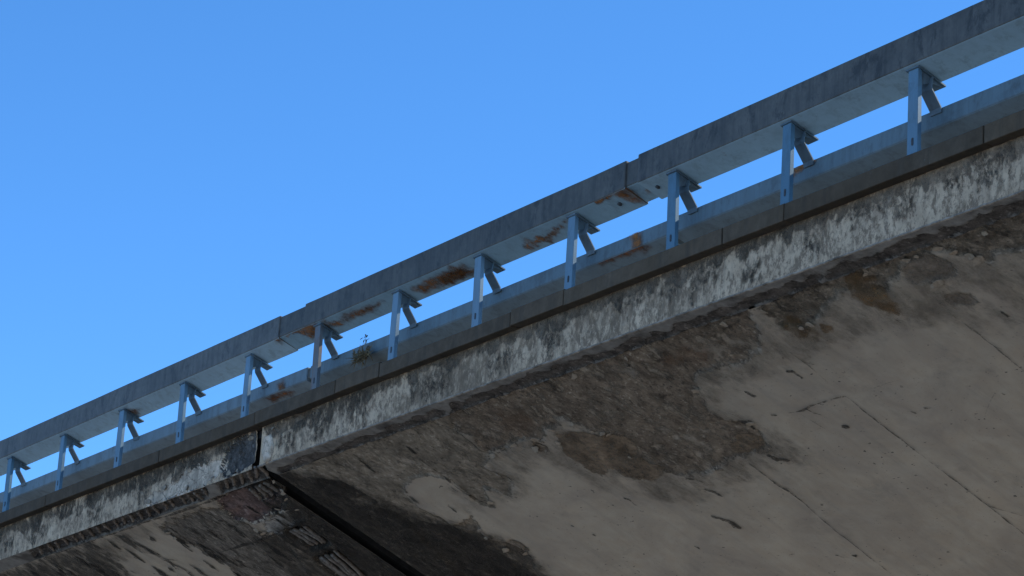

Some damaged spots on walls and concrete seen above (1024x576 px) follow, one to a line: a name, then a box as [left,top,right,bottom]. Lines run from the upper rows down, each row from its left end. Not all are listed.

corrosion [595,188,650,204]
corrosion [524,221,565,249]
corrosion [598,232,646,264]
corrosion [416,266,474,293]
corrosion [274,304,379,342]
leakage [0,135,1024,552]
peeling [30,200,1024,576]
crack [797,396,915,450]
leakage [0,529,174,576]
leakage [167,504,246,576]
leakage [246,471,546,576]